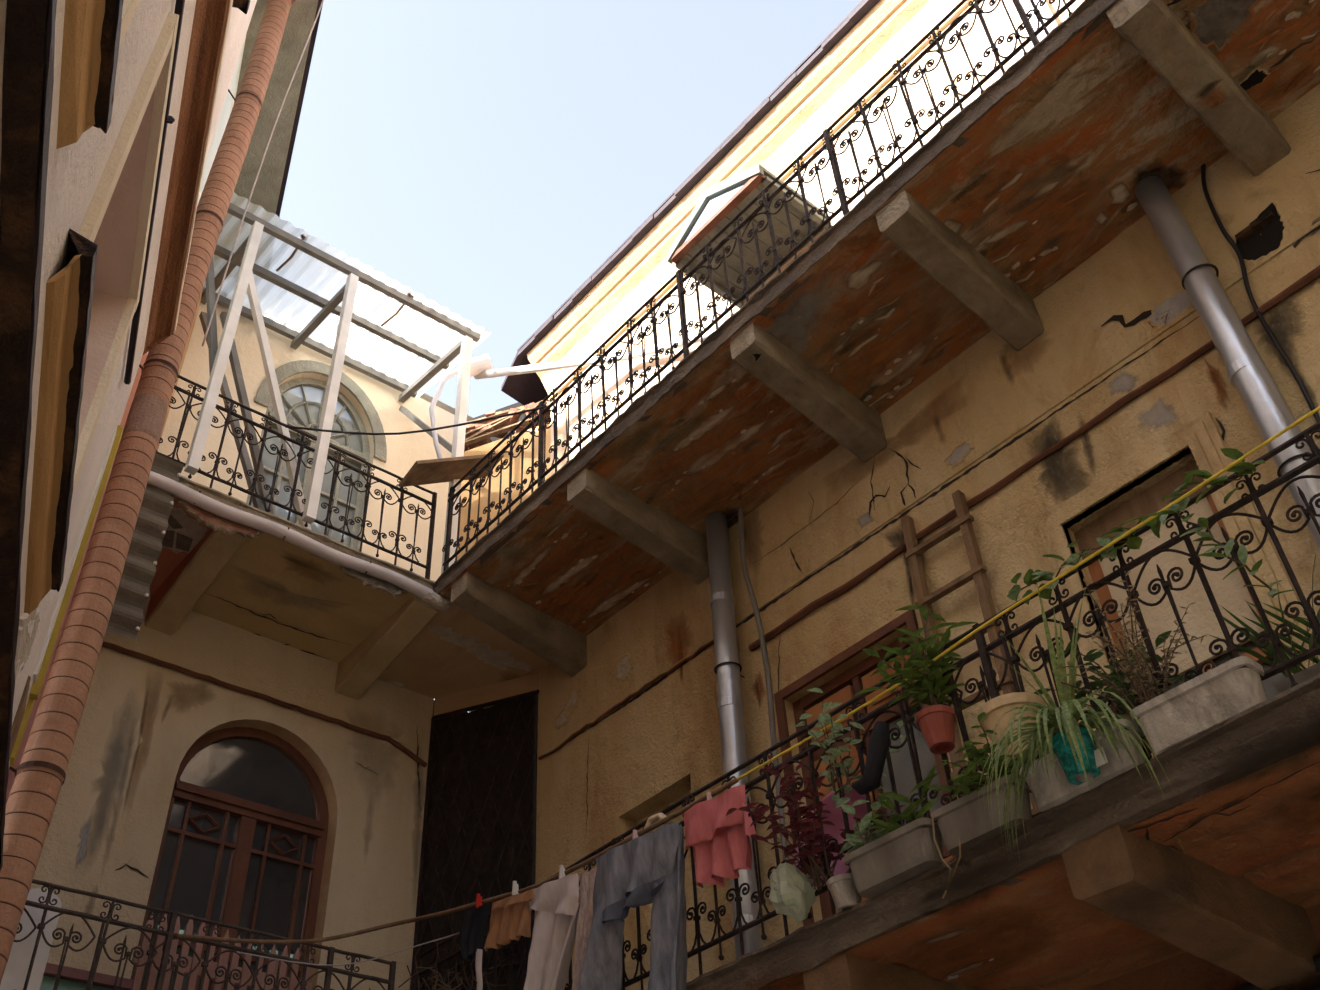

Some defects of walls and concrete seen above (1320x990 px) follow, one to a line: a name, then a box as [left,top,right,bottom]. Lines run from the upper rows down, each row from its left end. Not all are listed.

flaking render [1144,289,1194,331]
damp [1032,421,1093,494]
crack [570,310,1200,842]